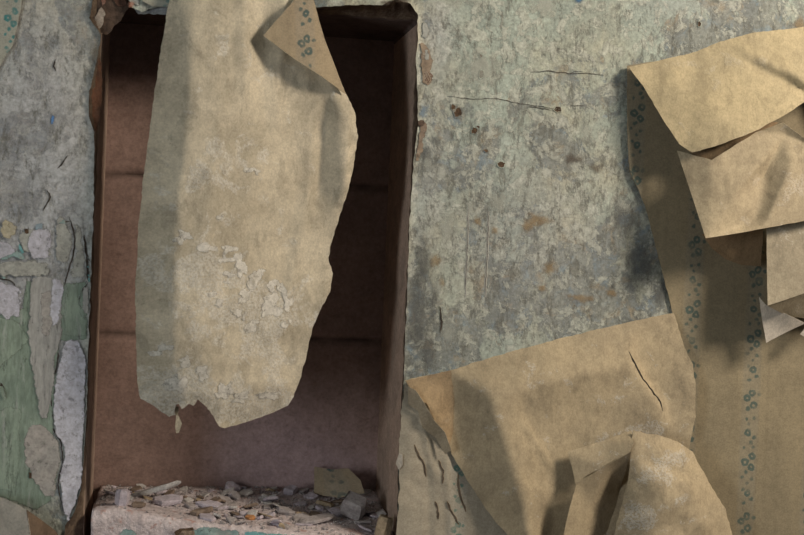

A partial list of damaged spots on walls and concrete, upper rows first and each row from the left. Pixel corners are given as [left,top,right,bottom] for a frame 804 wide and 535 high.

flaking render [95,0,168,35]
peeling [0,217,90,521]